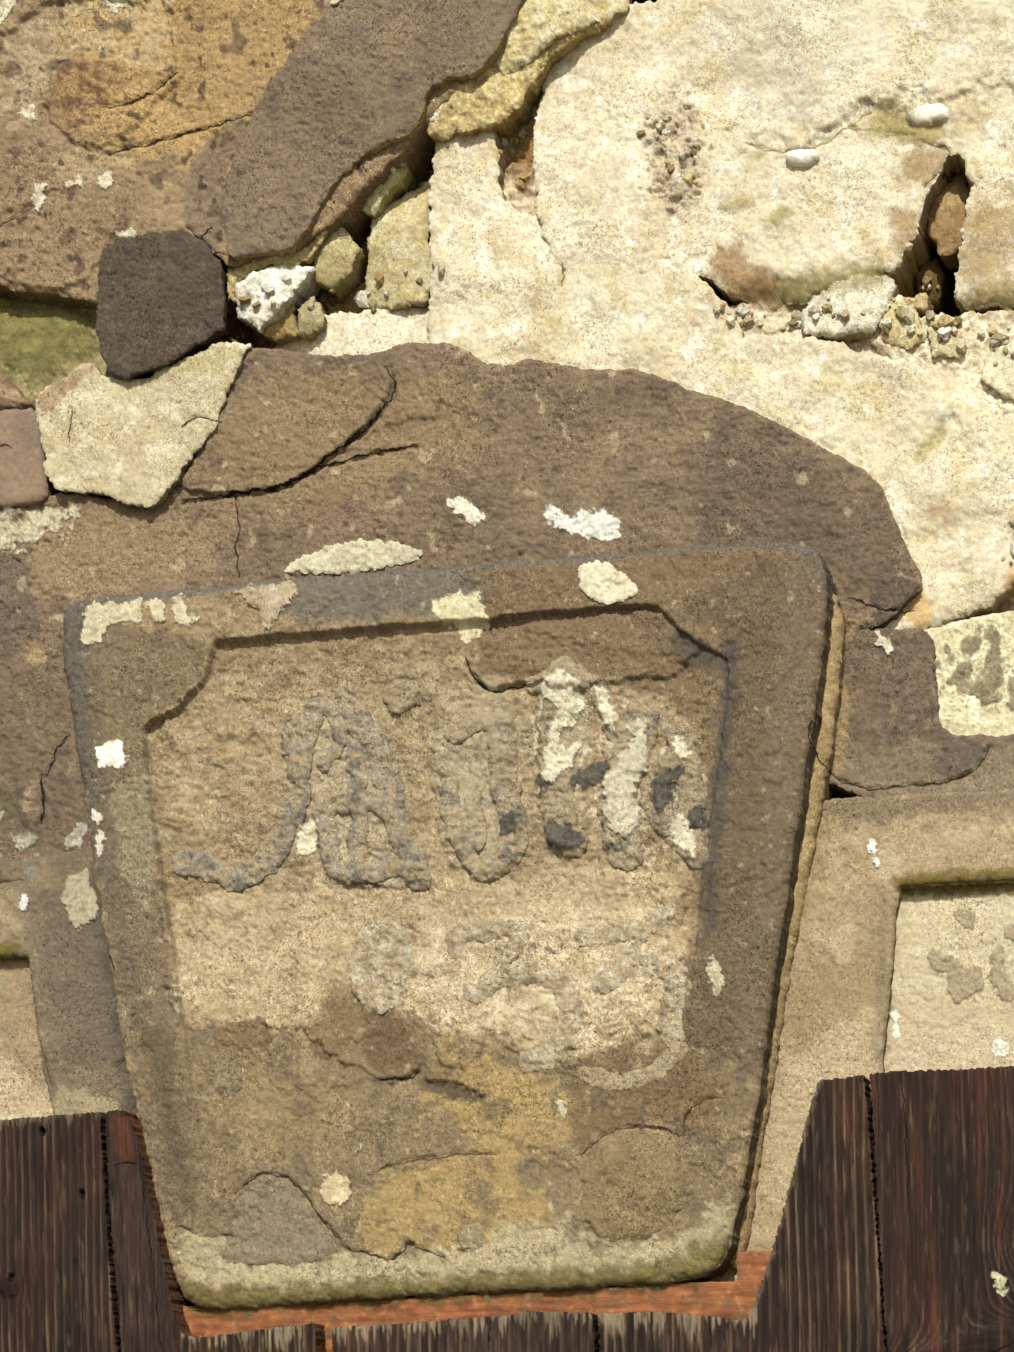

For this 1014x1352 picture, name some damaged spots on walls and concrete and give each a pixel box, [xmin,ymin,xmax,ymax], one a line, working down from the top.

crack [183,365,417,577]
crack [367,1153,496,1176]
crack [234,1172,445,1261]